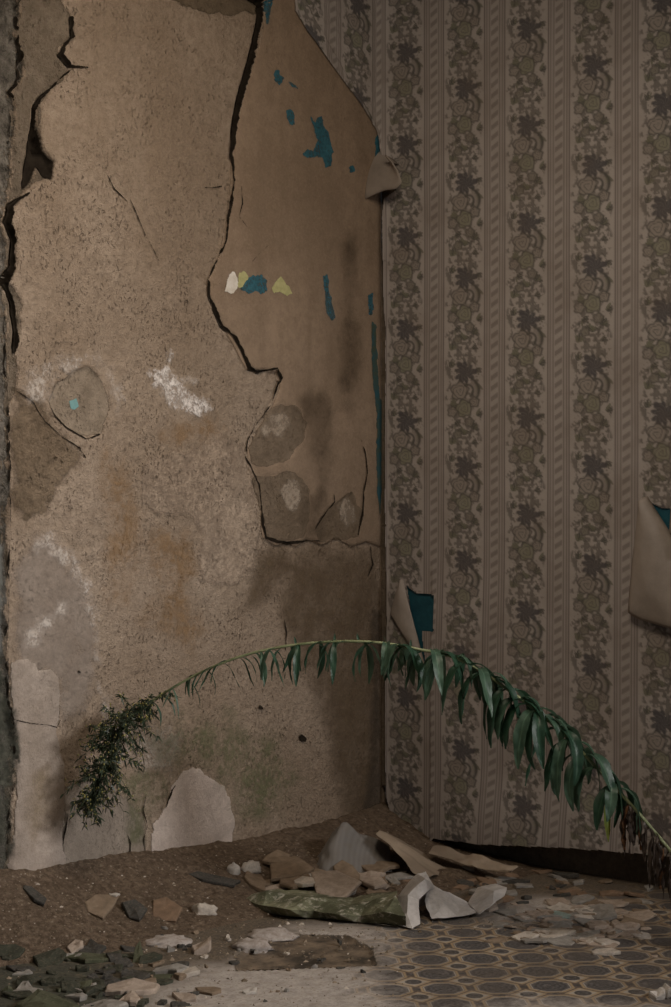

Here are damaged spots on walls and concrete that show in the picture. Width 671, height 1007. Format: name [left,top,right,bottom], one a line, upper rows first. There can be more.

crack [7,1,88,154]
spalling [175,0,273,24]
crack [205,0,335,545]
crack [0,192,30,521]
spalling [0,0,235,871]
water stain [150,353,211,417]
crack [358,447,374,576]
crack [4,545,16,754]
crack [6,782,15,869]